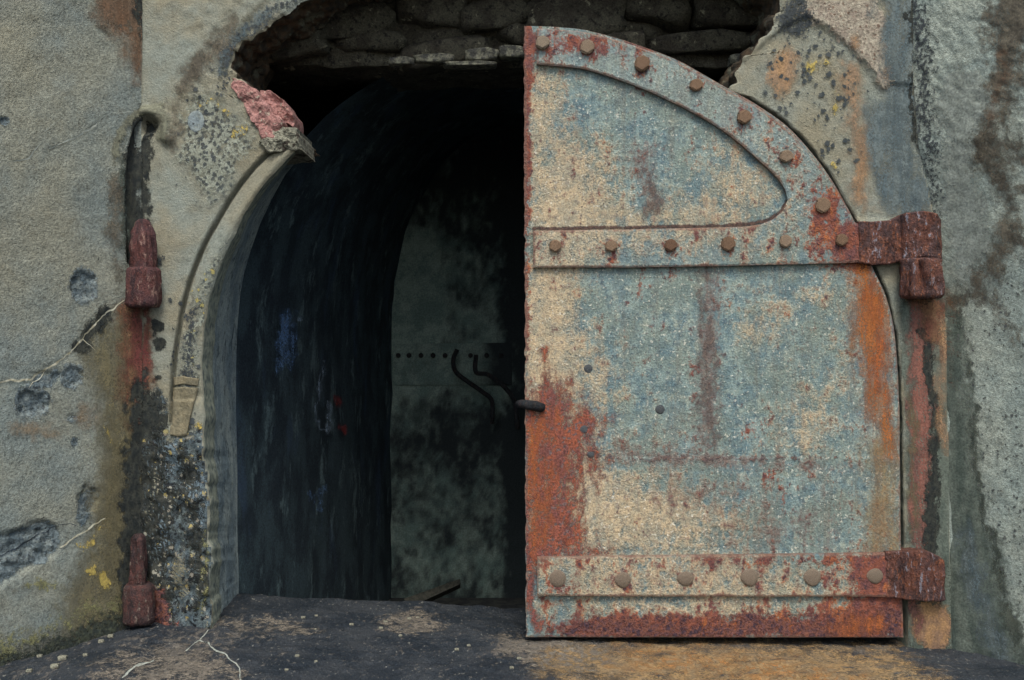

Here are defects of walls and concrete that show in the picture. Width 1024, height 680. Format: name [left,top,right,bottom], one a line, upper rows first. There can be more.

corrosion [526,264,955,680]